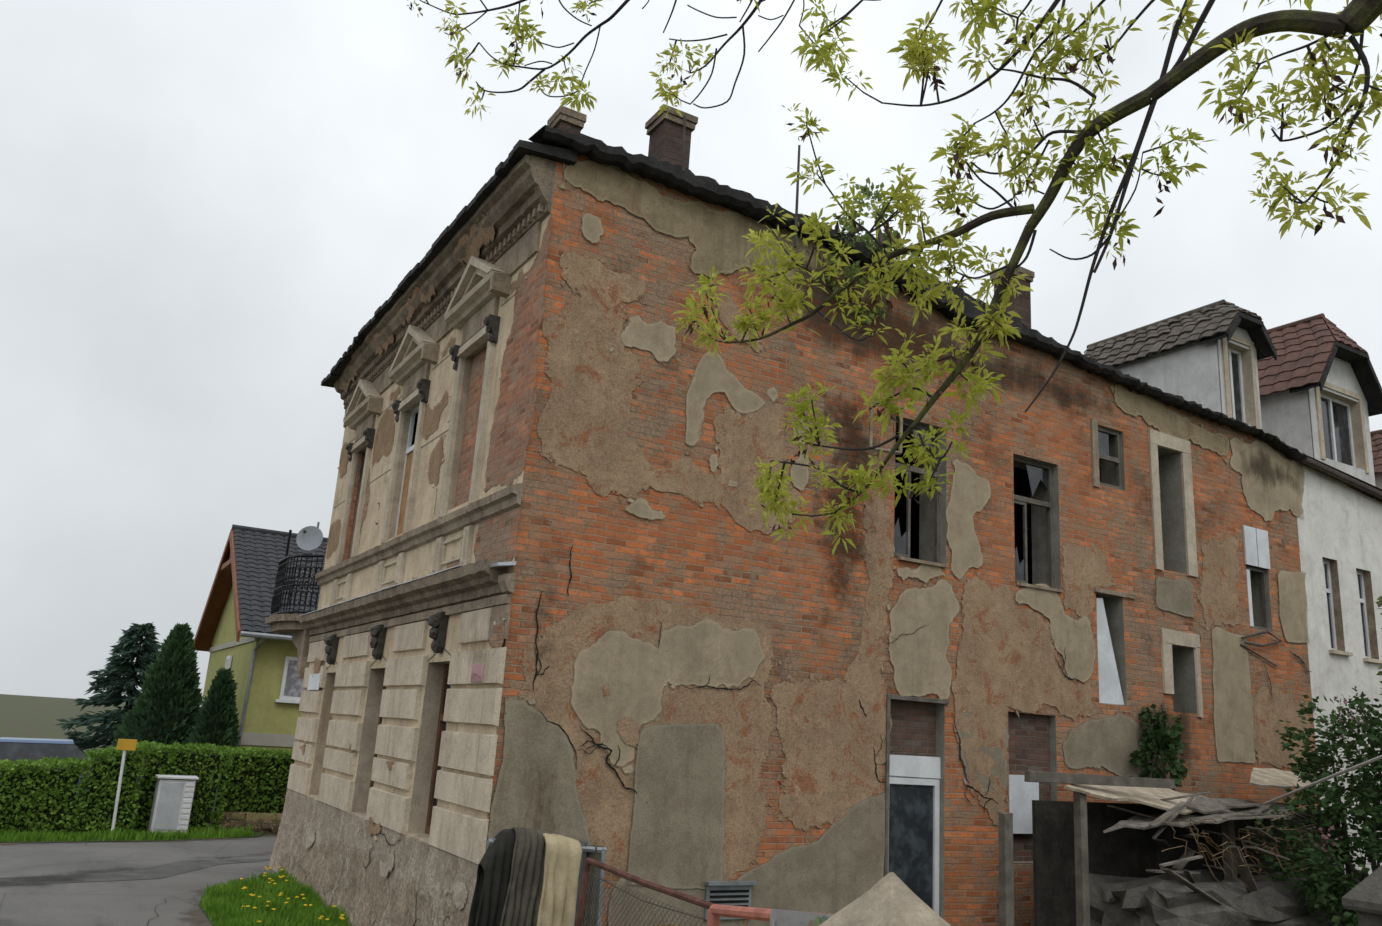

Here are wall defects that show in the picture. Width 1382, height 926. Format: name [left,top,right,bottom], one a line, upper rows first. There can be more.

spalling [483,160,842,535]
leakage [799,264,1087,405]
spalling [338,442,349,478]
spalling [359,386,400,543]
spalling [422,391,451,490]
crack [533,545,647,803]
spalling [486,459,1163,926]
crack [952,713,999,812]
peeling [1155,534,1312,769]